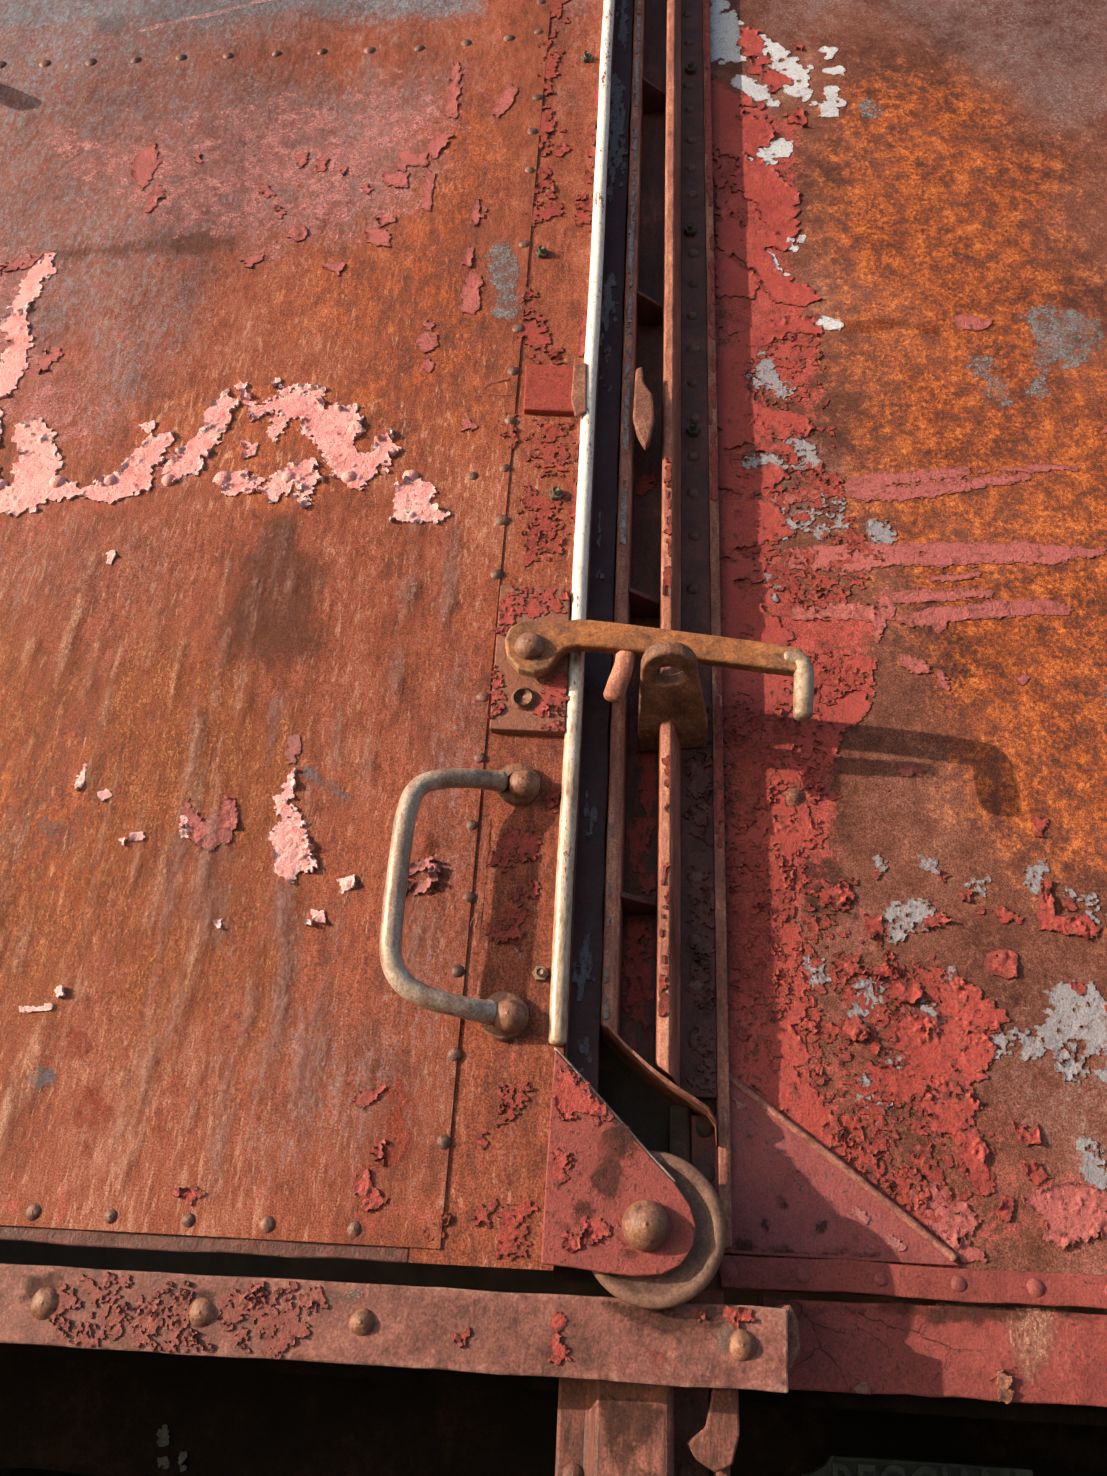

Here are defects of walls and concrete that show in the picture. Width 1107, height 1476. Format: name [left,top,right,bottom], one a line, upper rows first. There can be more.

peeling [509,0,641,453]
peeling [458,245,483,315]
peeling [0,252,451,525]
peeling [105,550,117,565]
corrosion [0,601,82,752]
spalling [74,763,112,802]
corrosion [0,638,298,1059]
peeling [268,734,319,885]
spalling [303,909,326,926]
spalling [336,874,356,894]
spalling [19,985,66,1013]
peeling [49,1272,329,1360]